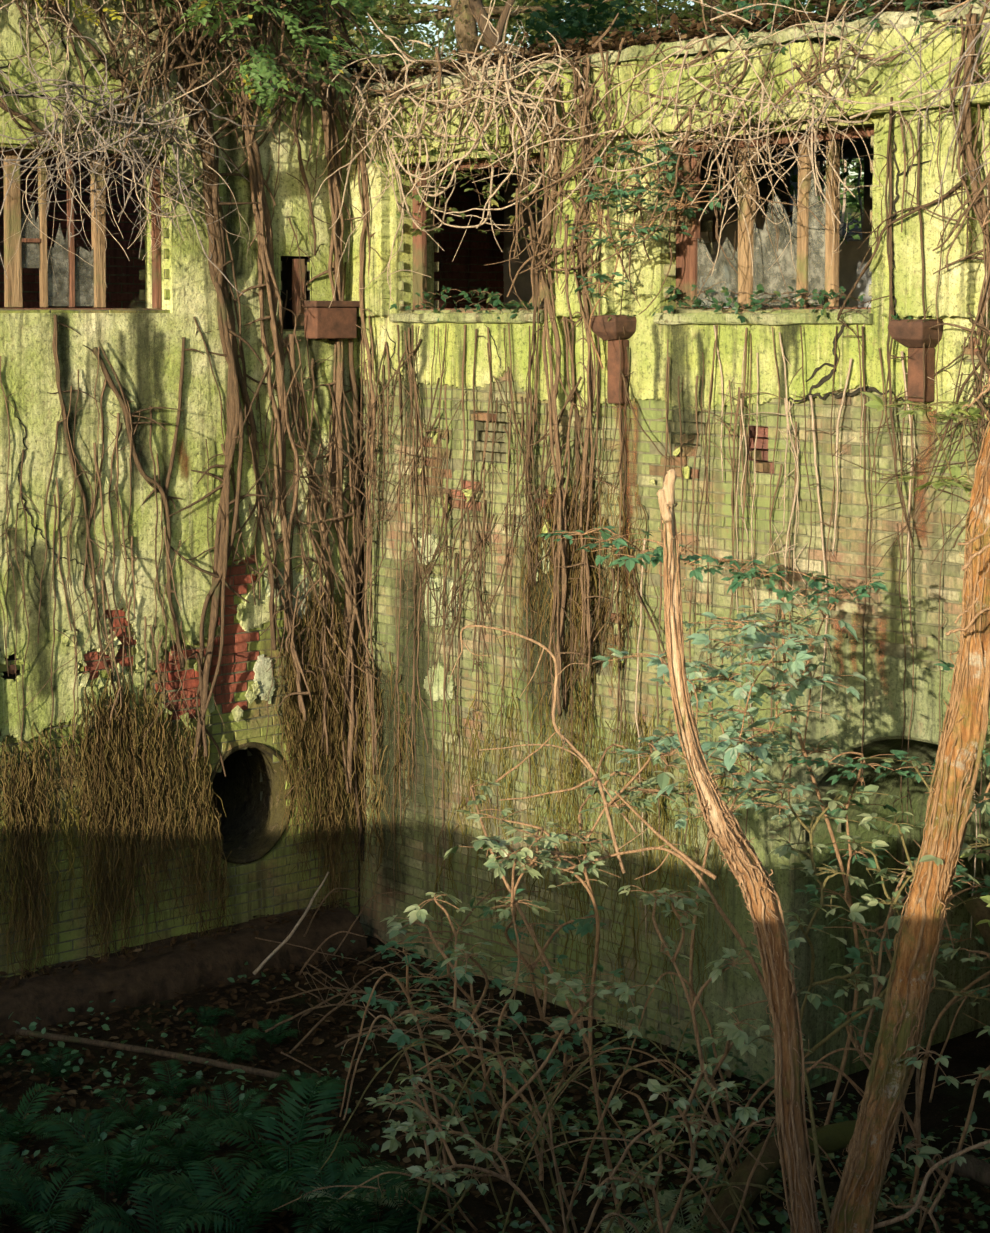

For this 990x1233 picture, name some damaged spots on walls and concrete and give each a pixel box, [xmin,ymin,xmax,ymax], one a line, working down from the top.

crack [892,130,931,316]
damp [52,310,89,587]
damp [118,306,171,528]
damp [652,308,704,444]
hole [745,426,774,474]
damp [779,324,801,403]
crack [788,310,904,402]
damp [7,528,51,695]
flaking render [61,555,311,729]